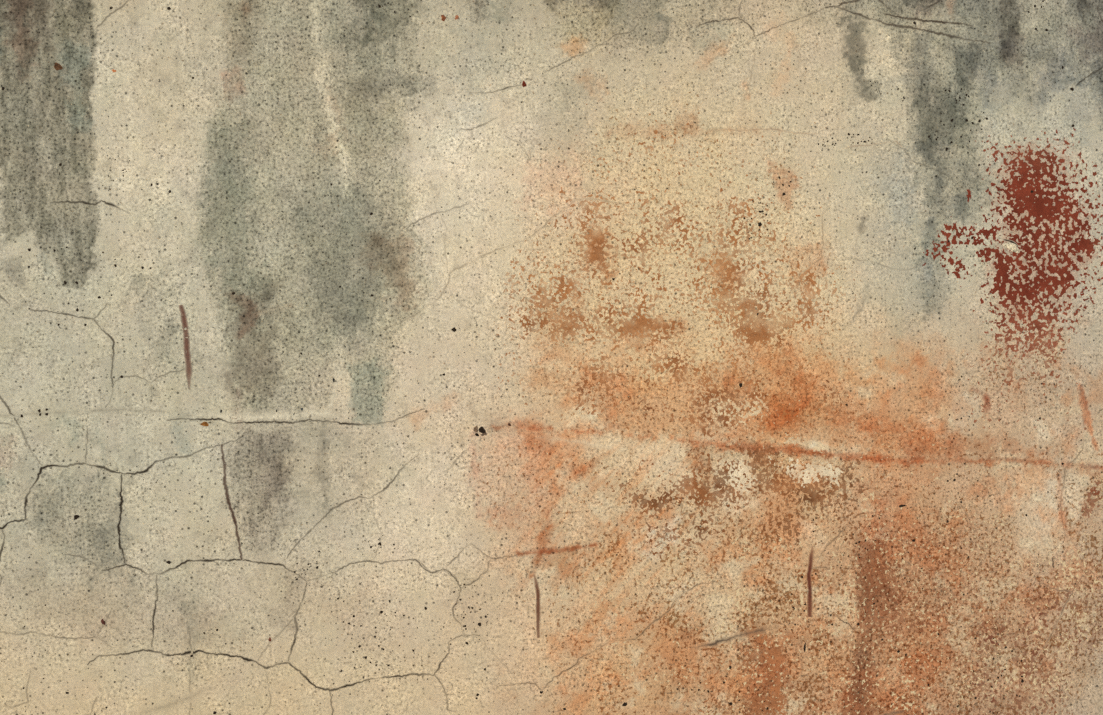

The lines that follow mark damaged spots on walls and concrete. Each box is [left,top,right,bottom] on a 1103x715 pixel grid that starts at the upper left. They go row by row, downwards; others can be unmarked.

damp [0,0,109,295]
crack [50,199,130,214]
crack [0,267,717,715]
crack [377,187,636,333]
damp [114,0,1103,564]
corrosion [405,61,1103,715]